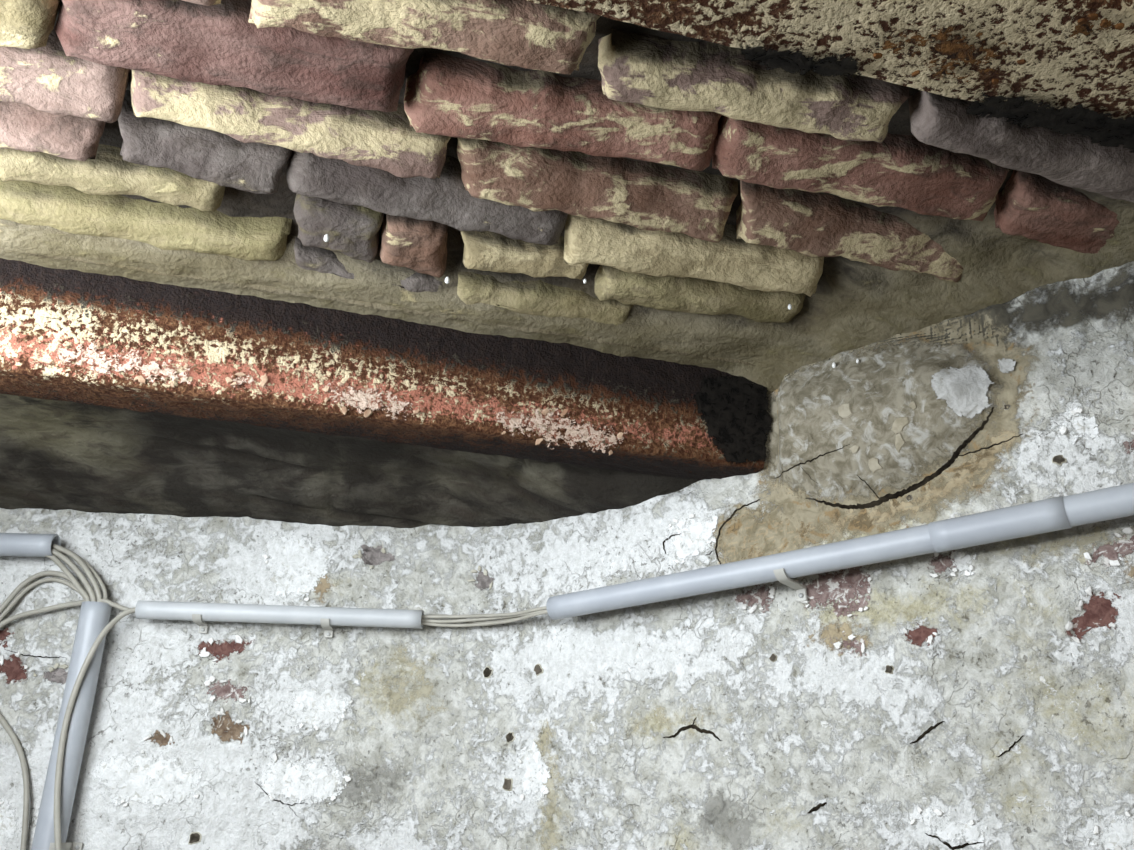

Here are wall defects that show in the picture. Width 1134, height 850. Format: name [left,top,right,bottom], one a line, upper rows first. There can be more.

corrosion [1064,13,1125,40]
corrosion [863,23,1026,85]
peeling [46,342,192,387]
peeling [225,372,269,390]
peeling [322,381,420,420]
peeling [494,409,627,456]
peeling [1059,407,1100,445]
spalling [1052,455,1067,465]
crack [706,407,1022,564]
peeling [665,513,718,564]
spalling [927,550,976,578]
spalling [1083,527,1134,569]